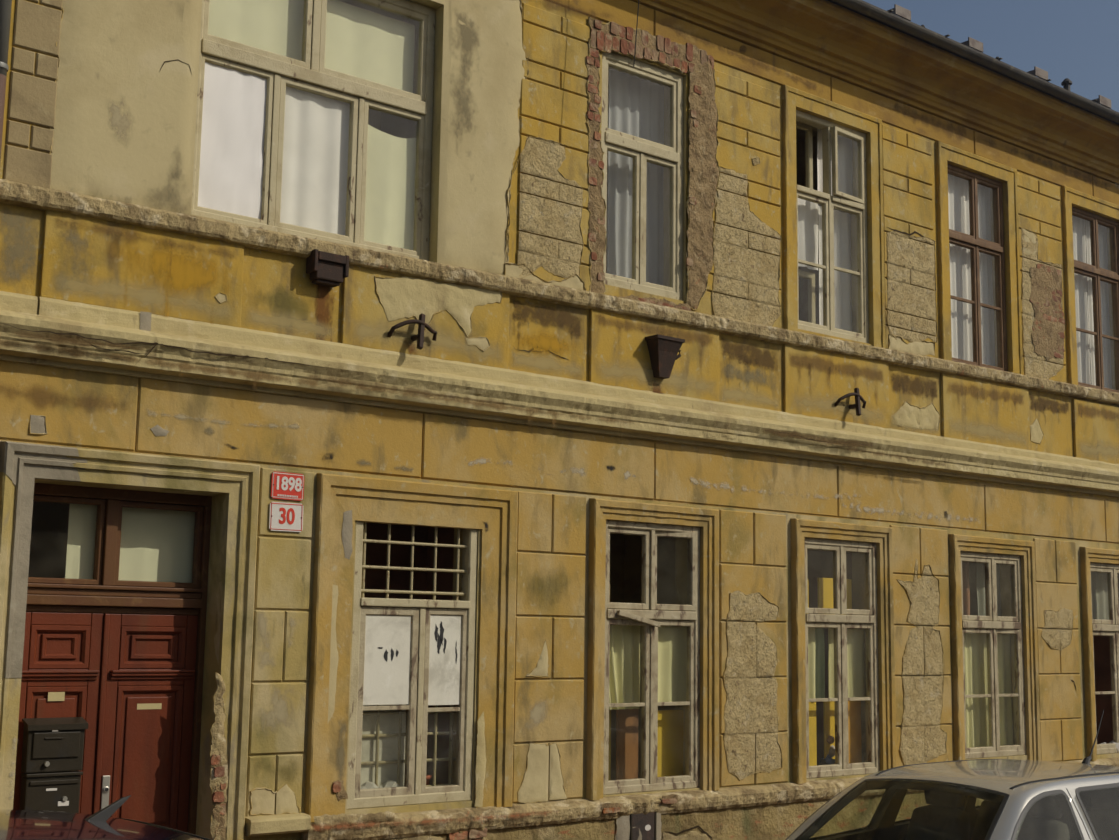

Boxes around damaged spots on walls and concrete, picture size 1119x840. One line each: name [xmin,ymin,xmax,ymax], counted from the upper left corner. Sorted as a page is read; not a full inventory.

spalling [504,17,782,326]
rust [315,284,333,342]
spalling [374,276,502,352]
water stain [513,300,581,336]
spalling [886,231,938,356]
flaking render [1021,228,1065,379]
spalling [722,590,783,781]
spalling [896,559,947,765]
spalling [209,672,231,840]
spalling [249,784,300,815]
spalling [517,741,567,803]
crack [663,825,712,840]